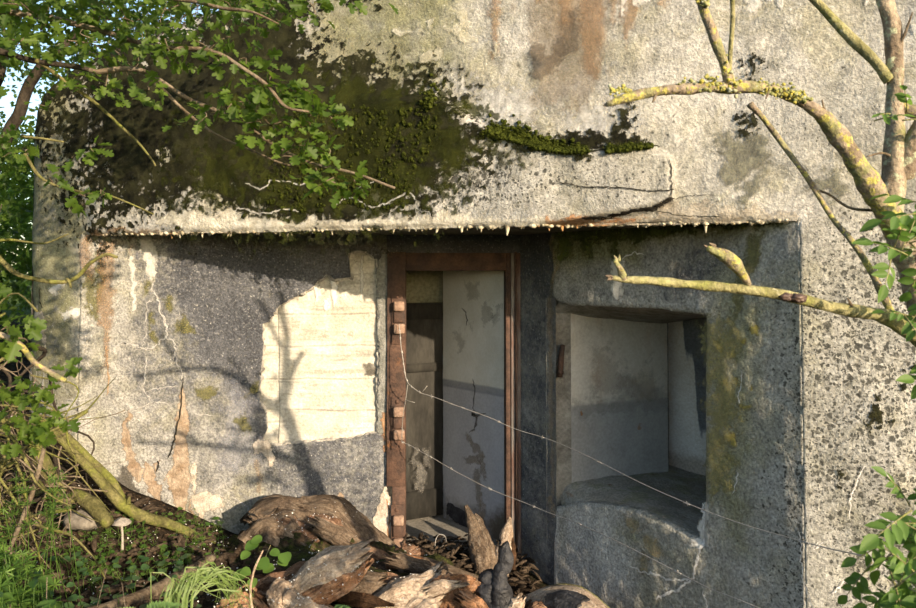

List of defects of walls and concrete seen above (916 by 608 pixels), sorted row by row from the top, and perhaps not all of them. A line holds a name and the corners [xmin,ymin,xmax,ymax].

rust [545,214,636,226]
crack [557,158,719,221]
crack [69,277,211,472]
peeling [252,251,387,467]
crack [471,381,486,431]
peeling [143,460,162,501]
peeling [188,463,225,519]
crack [630,503,708,608]